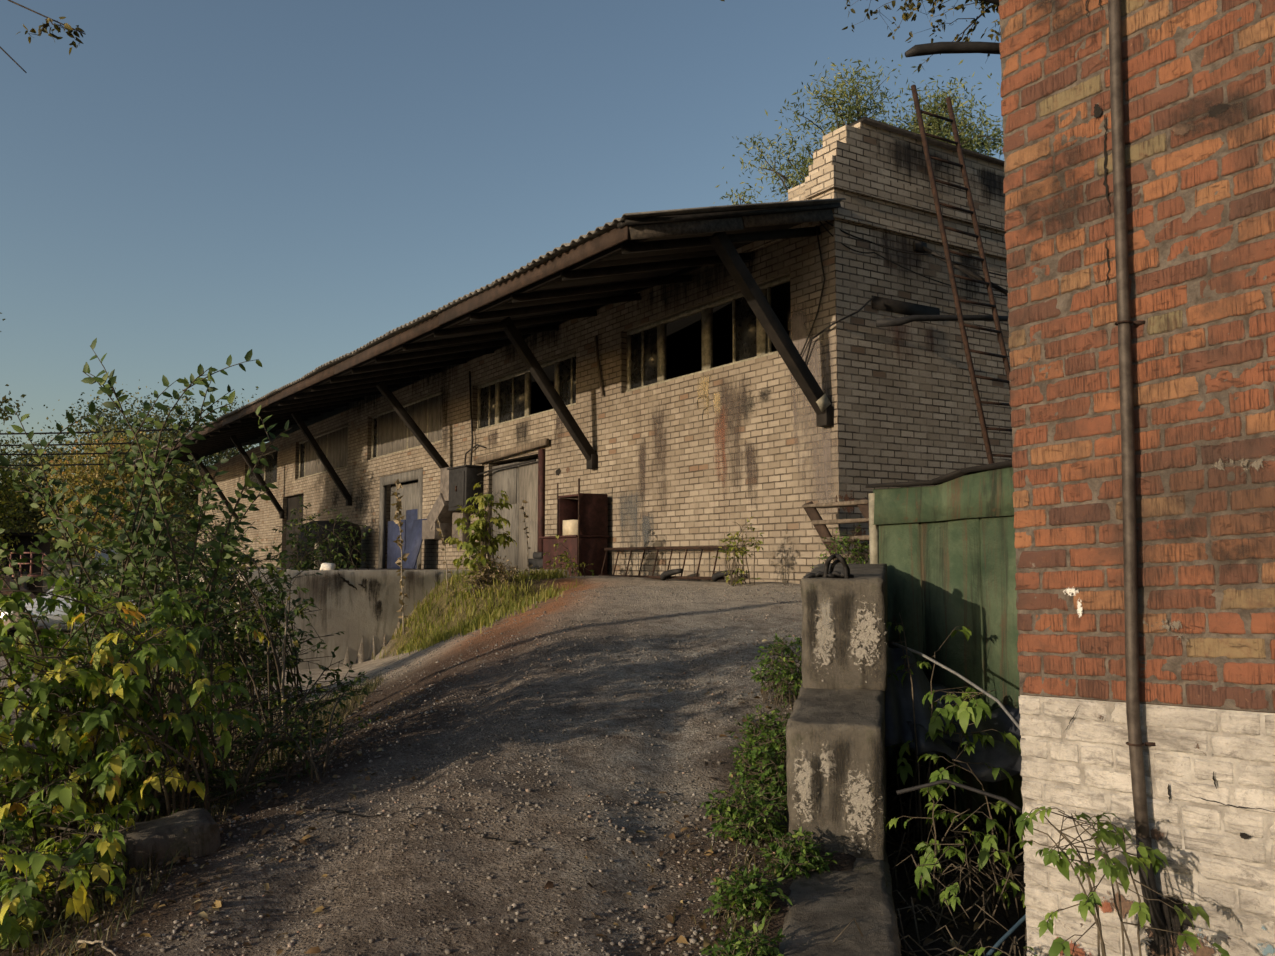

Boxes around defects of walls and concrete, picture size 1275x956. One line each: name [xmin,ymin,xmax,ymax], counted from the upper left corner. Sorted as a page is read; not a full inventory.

water stain [698,378,771,489]
water stain [621,412,666,546]
water stain [805,591,815,647]
water stain [810,742,847,821]
crack [303,807,535,848]